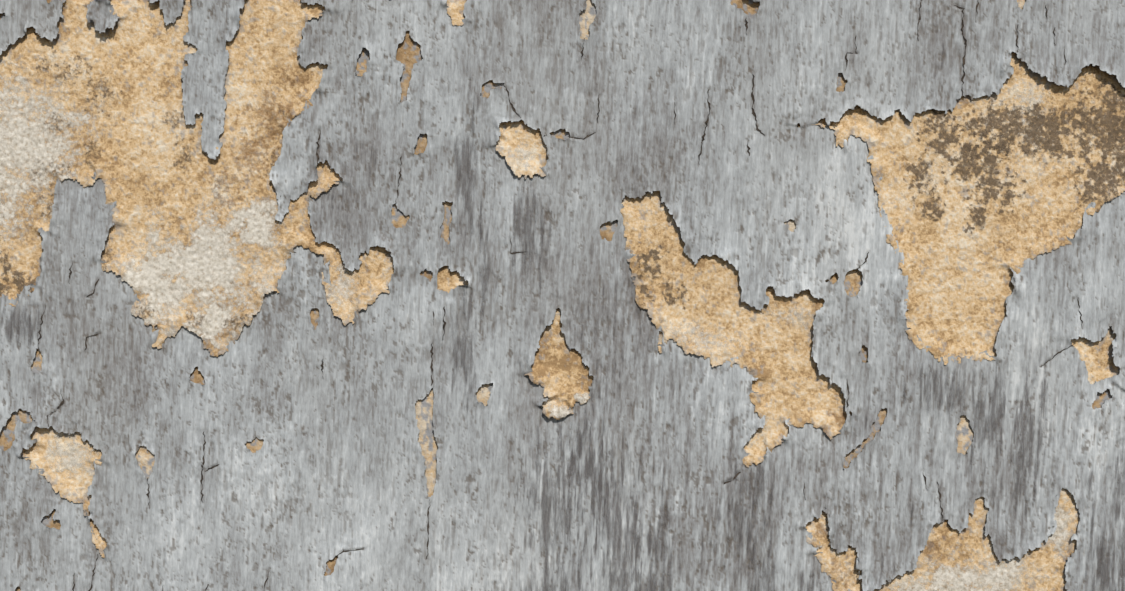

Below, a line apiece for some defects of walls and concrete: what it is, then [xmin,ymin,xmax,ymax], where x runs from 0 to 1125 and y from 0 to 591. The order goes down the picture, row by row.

peeling [396,31,423,103]
peeling [0,0,403,357]
peeling [487,116,570,179]
peeling [815,48,1125,365]
peeling [190,366,205,385]
peeling [420,264,474,293]
peeling [522,303,601,420]
peeling [600,181,863,468]
peeling [1063,326,1125,409]
peeling [0,408,116,559]
peeling [843,408,887,468]
peeling [801,479,1089,591]